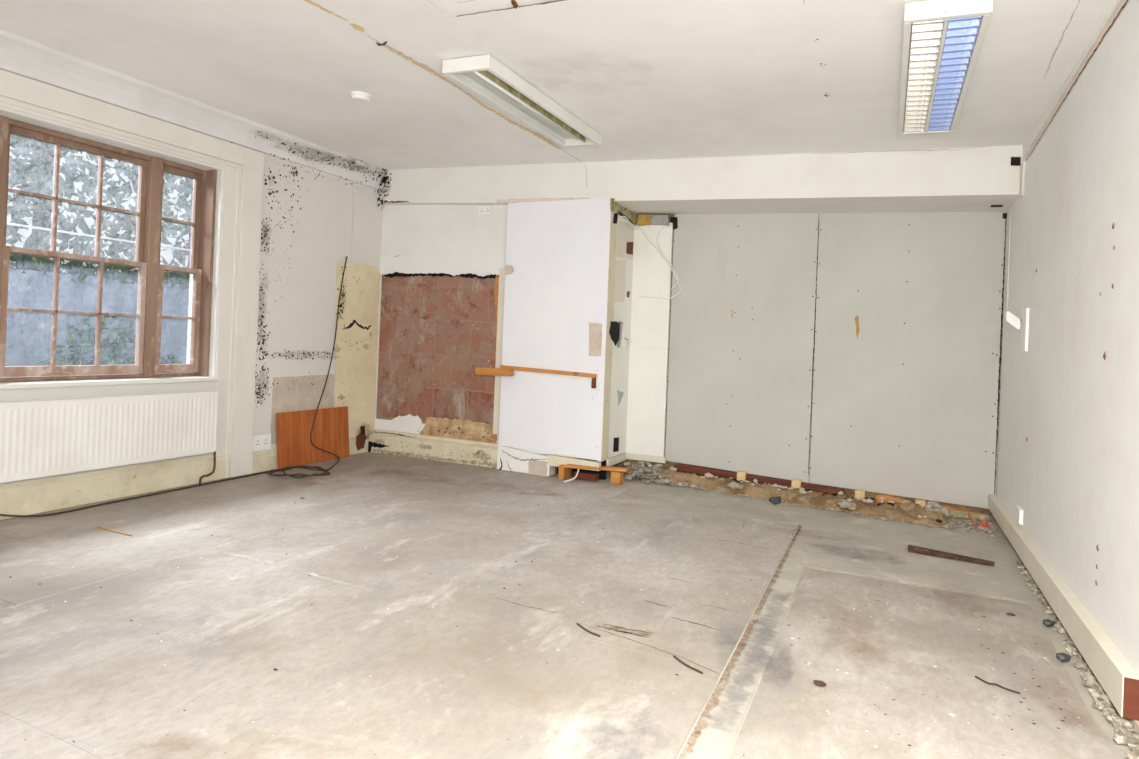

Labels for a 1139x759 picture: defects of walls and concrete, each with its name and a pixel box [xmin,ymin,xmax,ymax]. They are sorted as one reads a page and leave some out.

peeling [304,0,580,161]
water stain [255,131,391,404]
flaking render [270,260,499,444]